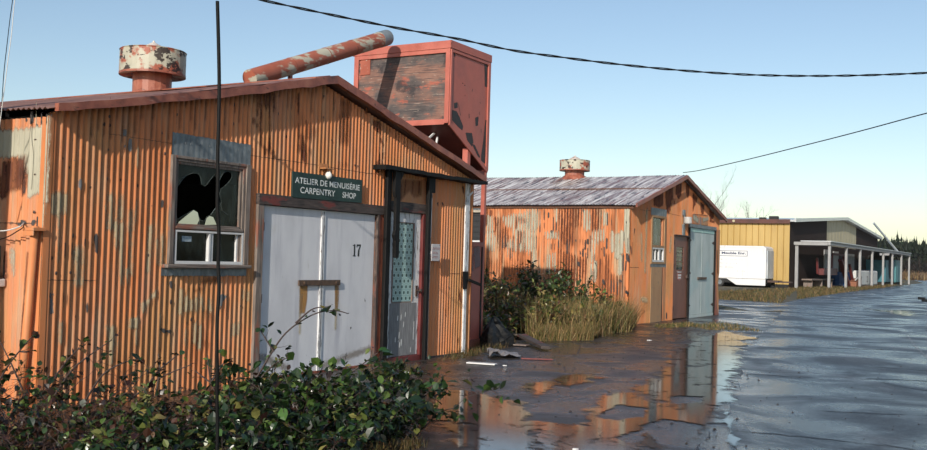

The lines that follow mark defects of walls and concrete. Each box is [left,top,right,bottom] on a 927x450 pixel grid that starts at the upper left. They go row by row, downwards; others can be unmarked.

rust [297,93,314,162]
rust [365,107,384,174]
rust [0,156,27,199]
peeling [0,102,137,286]
peeling [146,226,164,272]
rust [486,208,532,273]
peeling [472,208,648,305]
rust [557,208,621,302]
peeling [169,281,227,314]
peeling [107,325,115,364]
peeling [185,322,202,349]